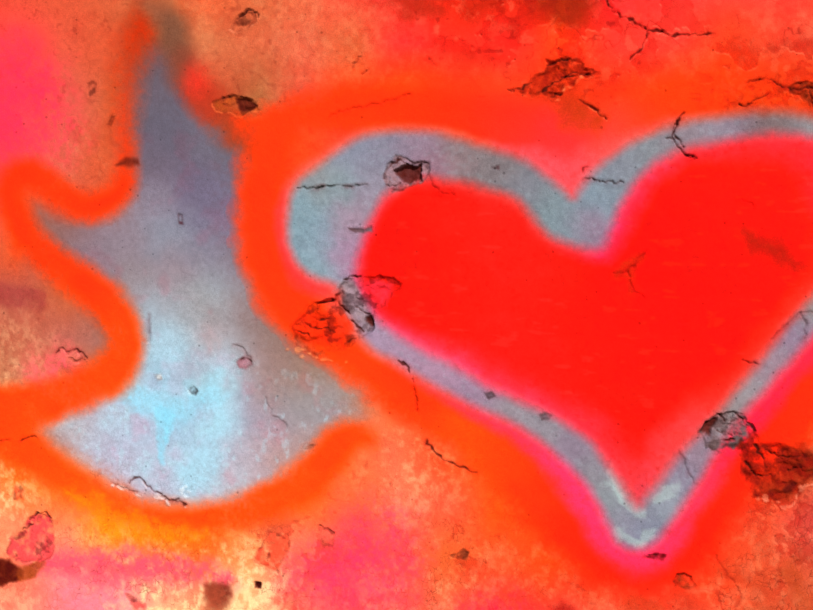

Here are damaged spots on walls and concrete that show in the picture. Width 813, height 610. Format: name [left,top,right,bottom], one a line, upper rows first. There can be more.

crack [603,0,719,62]
spalling [506,53,603,102]
spalling [210,91,262,120]
crack [665,110,700,163]
crack [295,181,371,193]
spalling [379,151,435,196]
spalling [285,272,406,365]
crack [738,307,813,367]
crack [421,436,480,477]
spalling [694,408,813,511]
crack [110,474,190,510]
spalling [4,509,58,566]